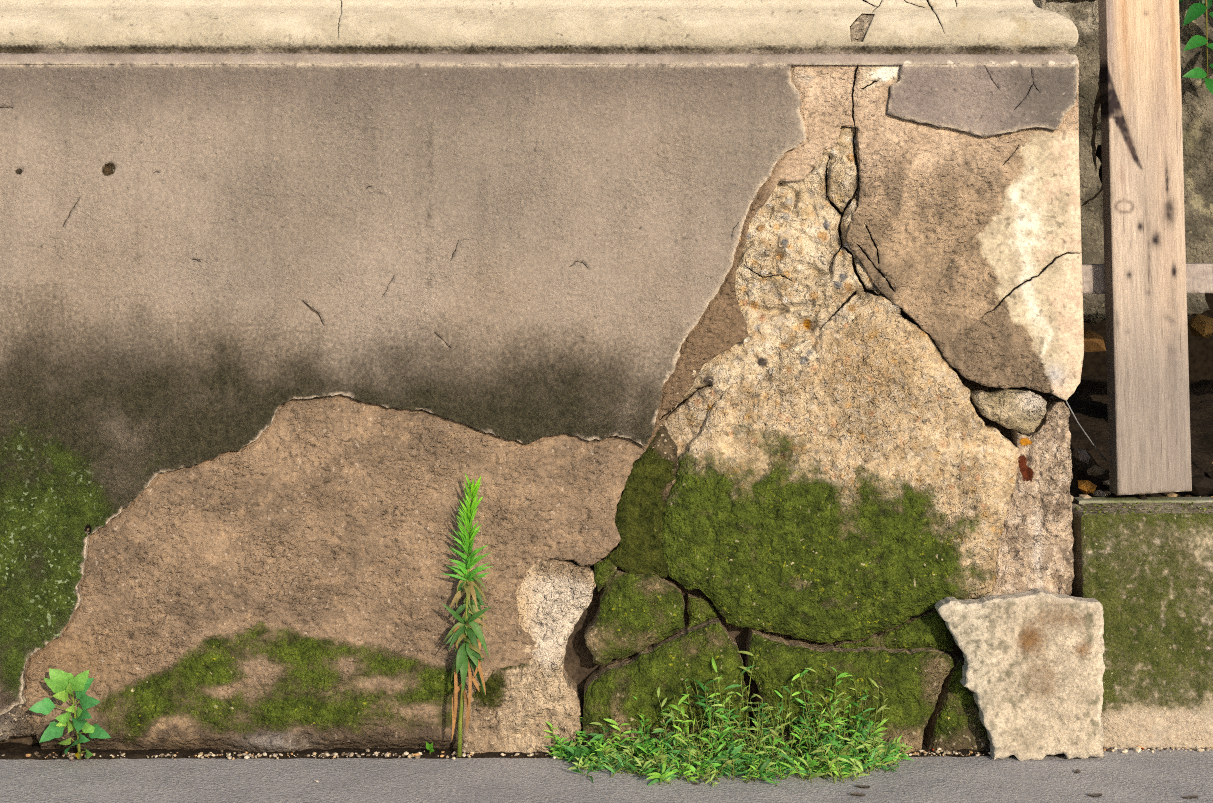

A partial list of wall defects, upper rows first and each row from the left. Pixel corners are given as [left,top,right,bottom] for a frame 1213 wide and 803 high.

crack [862,0,941,25]
crack [821,65,895,328]
crack [982,252,1079,317]
leakage [0,335,662,555]
flaking render [0,60,1084,756]